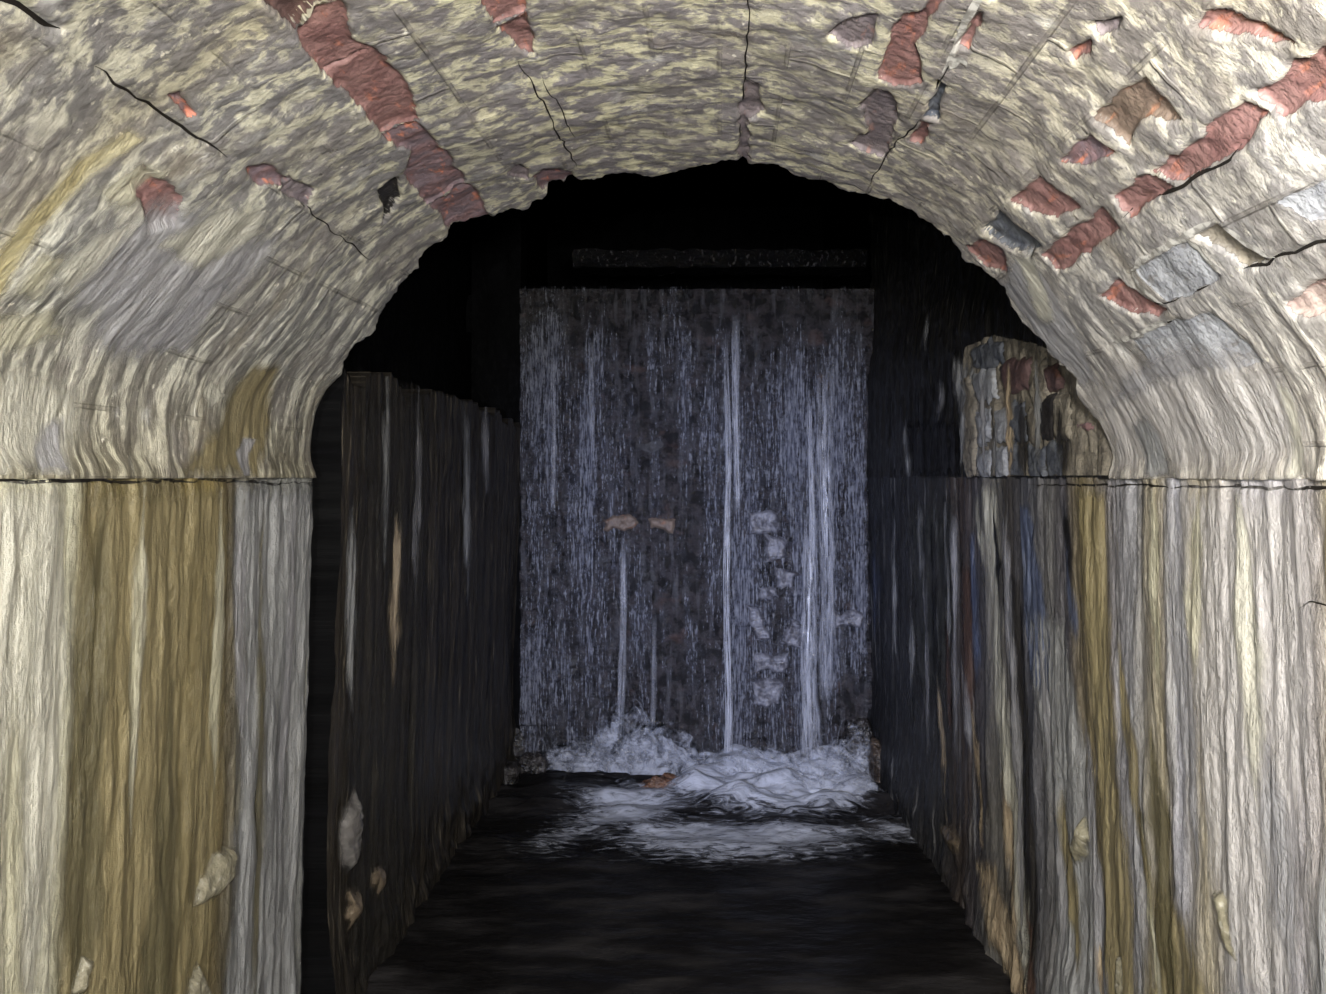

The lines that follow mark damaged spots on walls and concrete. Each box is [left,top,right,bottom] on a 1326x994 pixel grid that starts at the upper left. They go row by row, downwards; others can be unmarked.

crack [0,0,60,29]
crack [95,66,227,157]
spalling [264,0,491,230]
spalling [481,0,535,52]
spalling [828,0,946,158]
spalling [967,8,1326,272]
water stain [22,207,270,357]
crack [1243,239,1326,269]
crack [0,478,306,486]
water stain [0,366,313,994]
water stain [892,491,1205,994]
water stain [1150,498,1302,994]